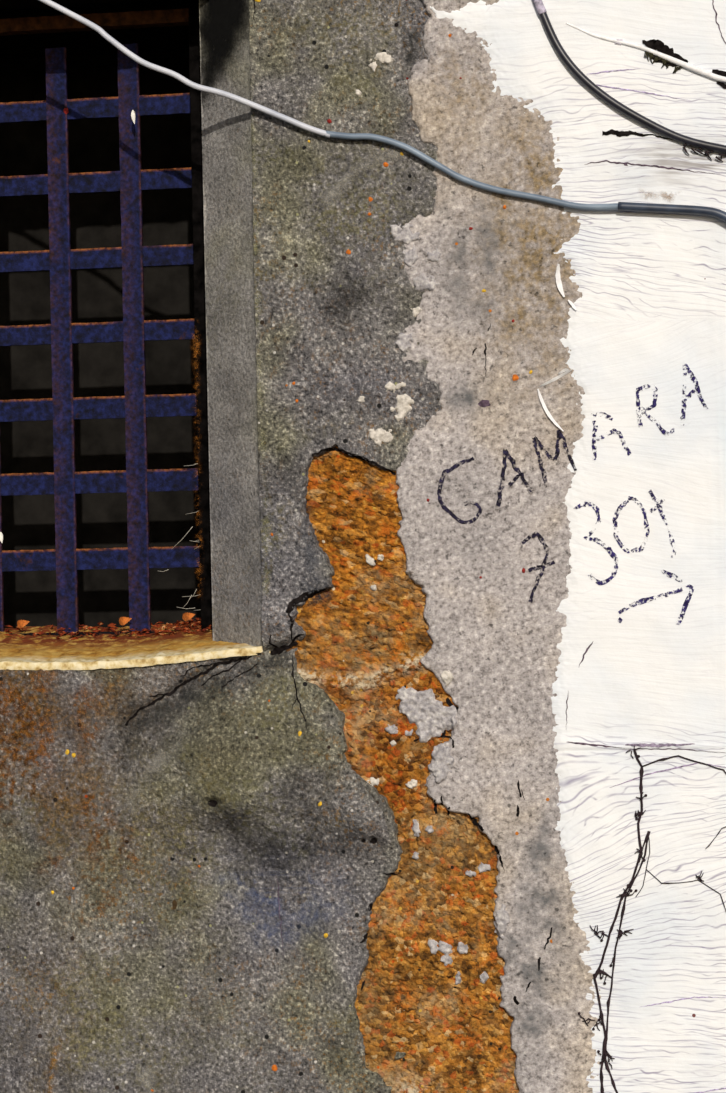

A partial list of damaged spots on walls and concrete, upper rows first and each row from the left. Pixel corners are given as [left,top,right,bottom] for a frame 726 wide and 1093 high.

crack [125,589,326,732]
spalling [286,446,519,1093]